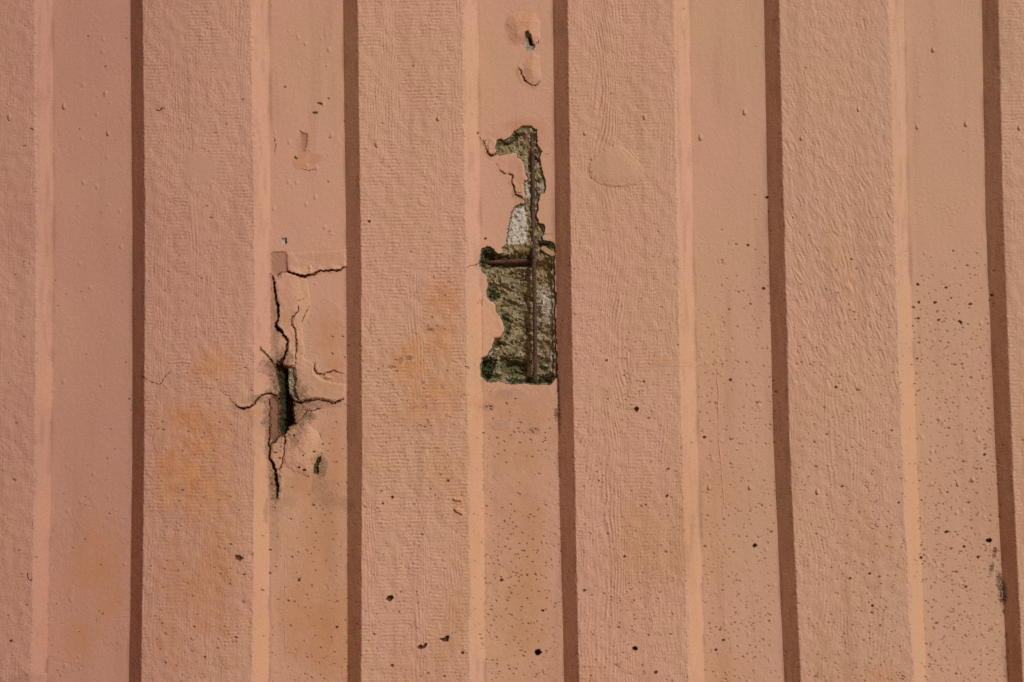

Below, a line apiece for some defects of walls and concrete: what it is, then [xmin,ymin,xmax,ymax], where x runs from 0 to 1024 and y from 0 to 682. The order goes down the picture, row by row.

corrosion [484,107,551,184]
spalling [479,125,558,385]
crack [223,267,346,498]